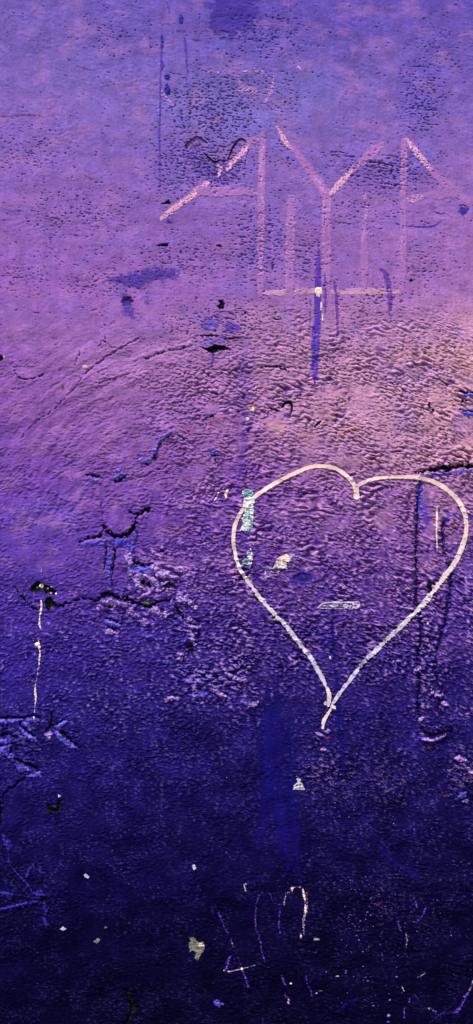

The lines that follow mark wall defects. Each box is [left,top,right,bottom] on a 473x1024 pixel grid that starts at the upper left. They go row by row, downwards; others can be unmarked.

crack [17,502,184,619]